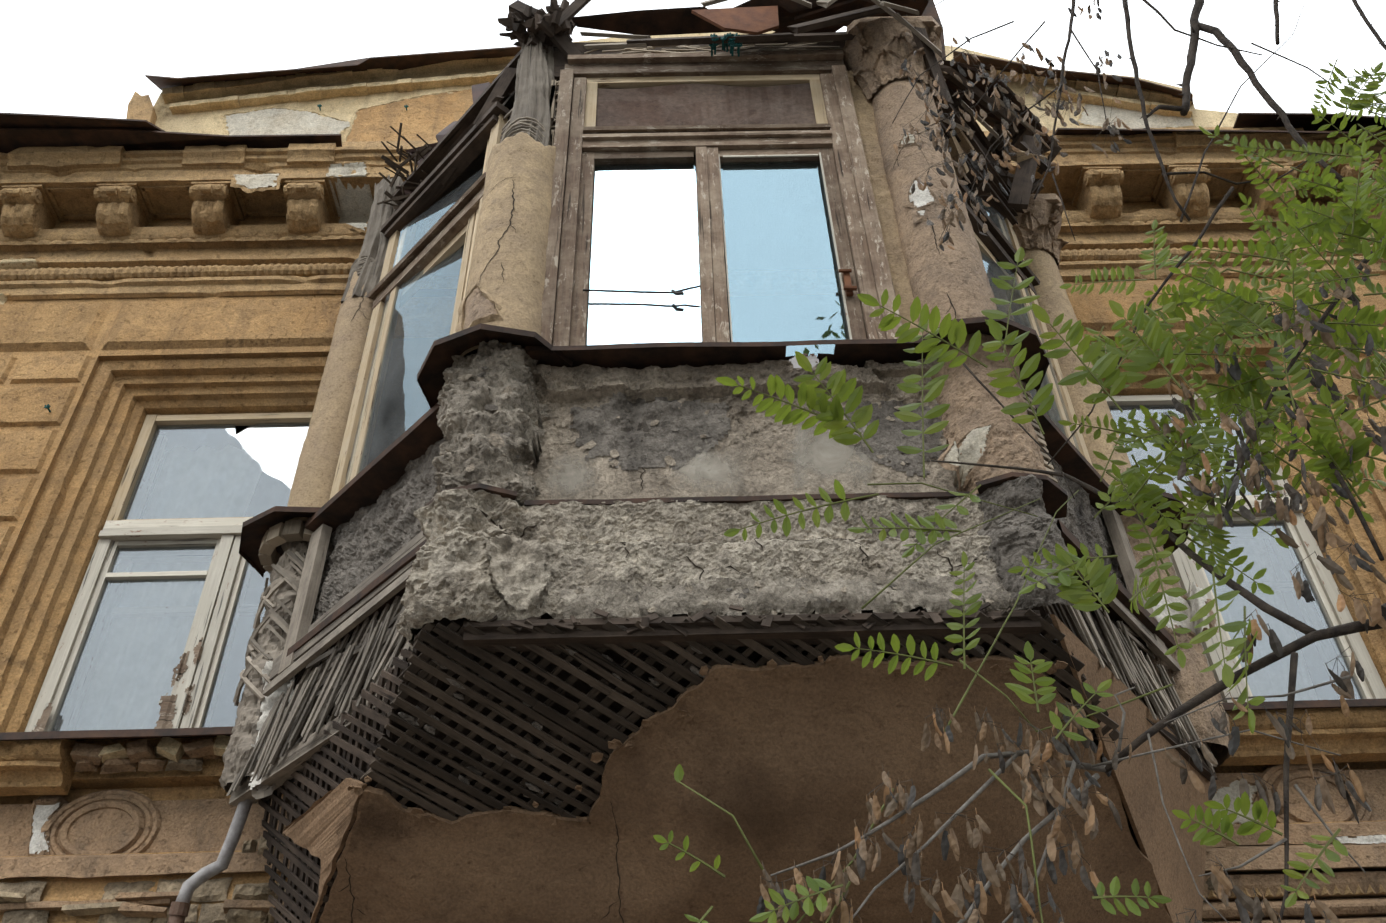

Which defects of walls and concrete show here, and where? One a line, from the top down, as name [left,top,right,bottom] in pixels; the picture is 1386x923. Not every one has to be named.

peeling [221,88,473,142]
peeling [230,171,285,193]
peeling [326,160,373,234]
spalling [902,174,941,224]
crack [480,177,516,284]
peeling [154,637,203,729]
spalling [347,648,1079,829]
spalling [24,795,69,856]
spalling [242,836,291,855]
spalling [1209,775,1264,825]
spalling [0,877,296,923]
crack [339,859,365,923]